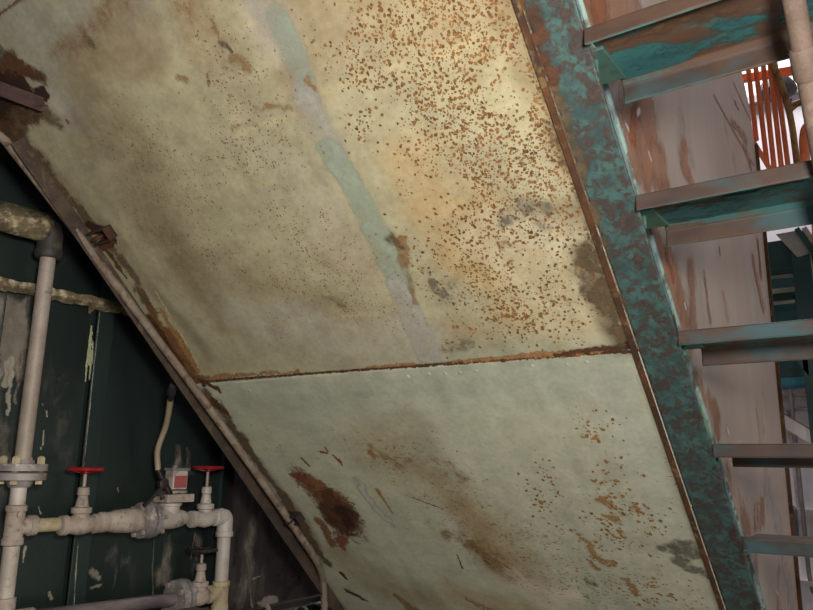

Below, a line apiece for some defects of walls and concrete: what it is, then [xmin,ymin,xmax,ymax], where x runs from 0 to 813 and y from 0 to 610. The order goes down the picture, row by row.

rust [0,81,49,111]
rust [31,0,642,393]
damp [0,296,30,472]
rust [694,370,720,443]
rust [290,457,364,551]
rust [345,406,708,609]